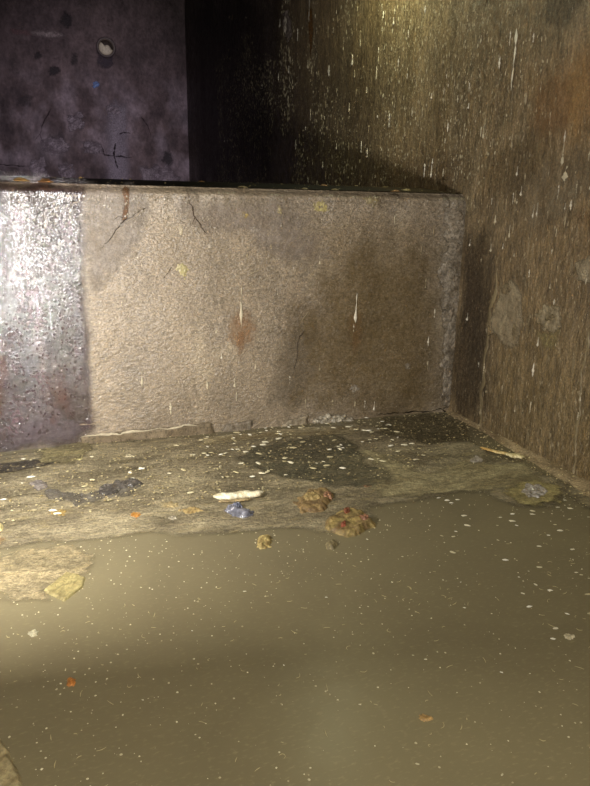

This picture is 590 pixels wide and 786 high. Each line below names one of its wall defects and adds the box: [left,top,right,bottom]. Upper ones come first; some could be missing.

crack [102,132,130,168]
crack [103,208,148,248]
peeling [486,280,523,349]